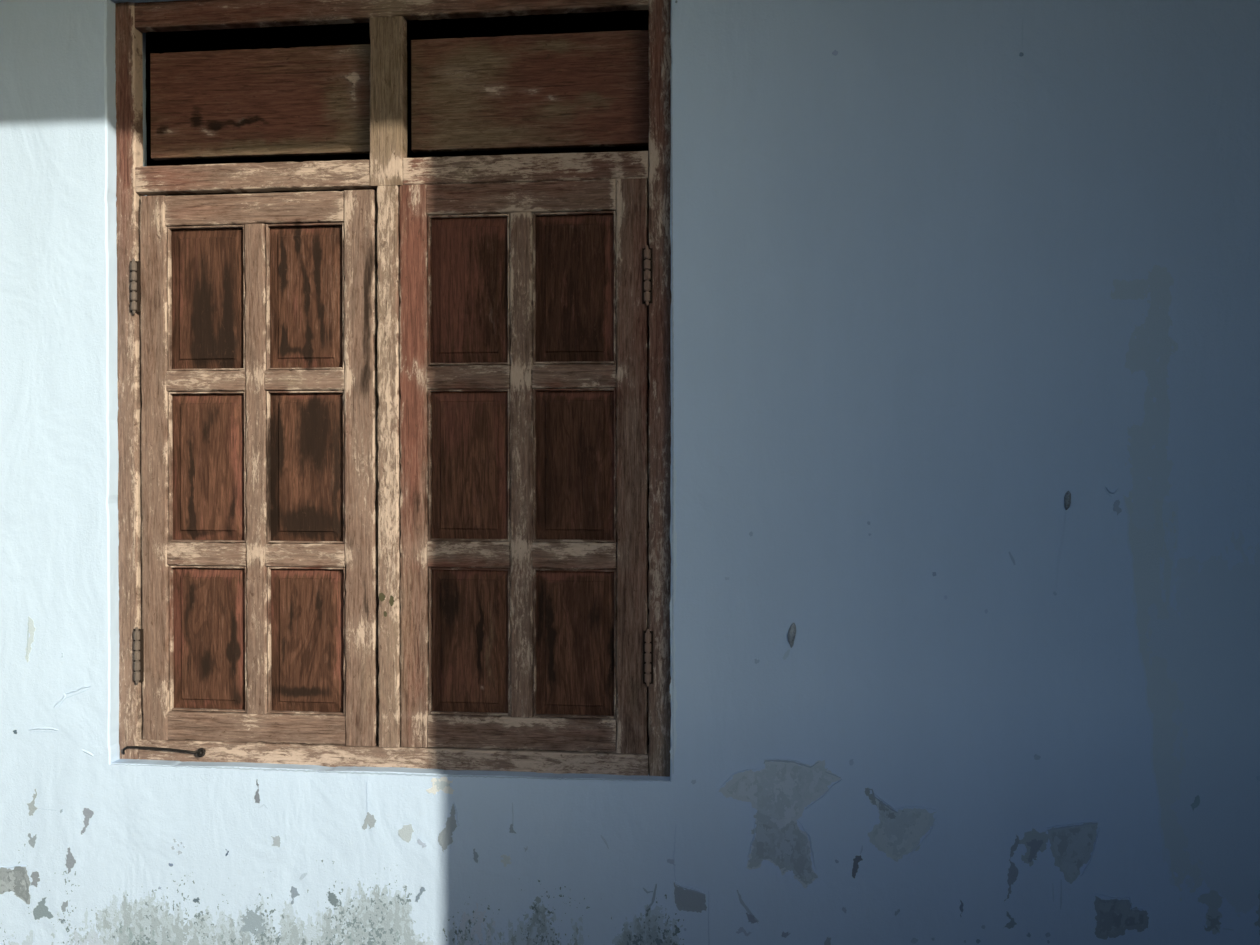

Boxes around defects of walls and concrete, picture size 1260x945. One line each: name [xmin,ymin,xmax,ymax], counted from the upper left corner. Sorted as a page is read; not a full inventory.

peeling [398,804,457,853]
peeling [0,866,68,924]
peeling [674,883,707,913]
peeling [852,855,863,878]
peeling [1004,822,1098,929]
peeling [1094,896,1149,940]